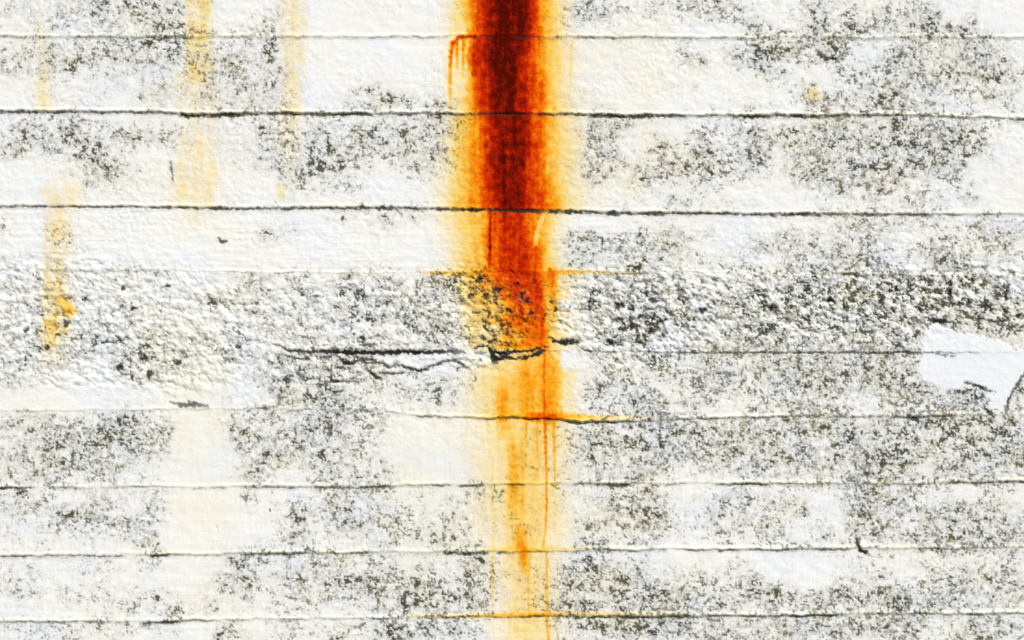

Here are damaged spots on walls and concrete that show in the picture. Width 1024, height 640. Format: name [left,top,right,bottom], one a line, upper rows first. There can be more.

leakage [0,0,535,640]
rust [409,0,627,640]
leakage [547,0,1024,640]
spalling [740,264,854,323]
spalling [863,267,964,323]
spalling [940,265,1024,319]
crack [269,333,1024,420]